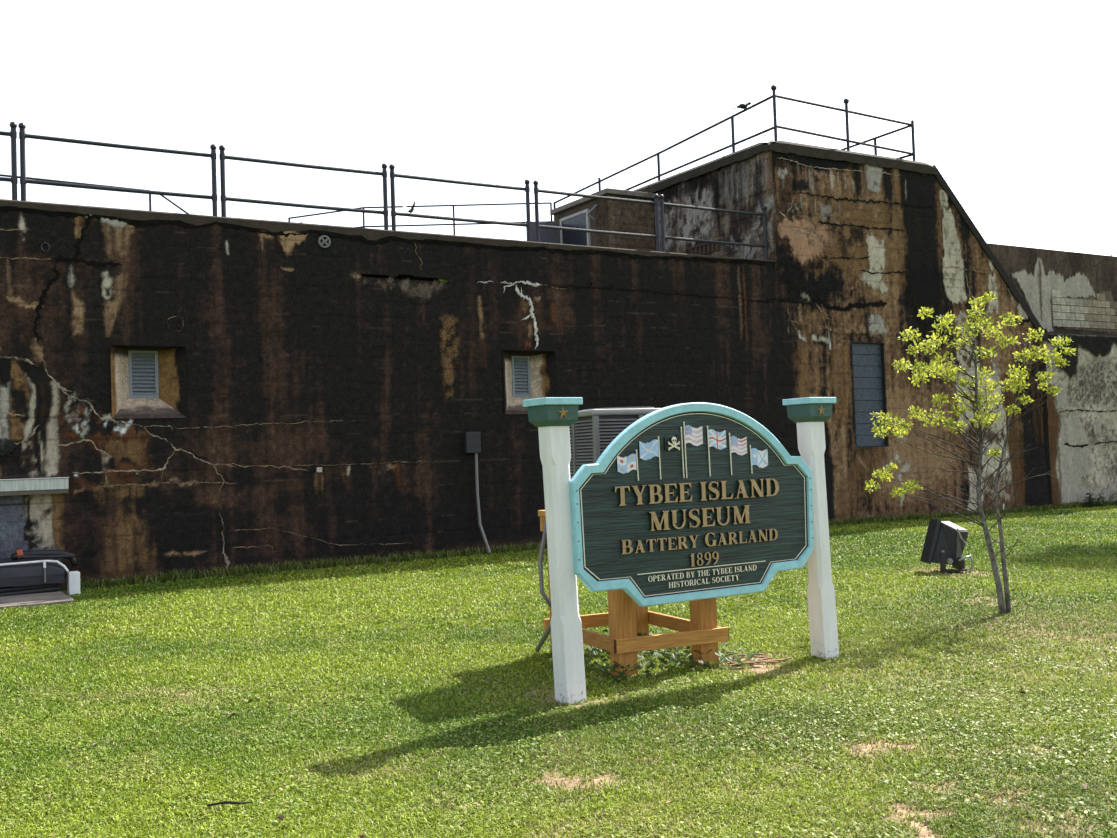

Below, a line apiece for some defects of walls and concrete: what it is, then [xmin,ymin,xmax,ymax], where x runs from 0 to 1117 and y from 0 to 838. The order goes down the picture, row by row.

damp [102,272,123,334]
crack [477,256,906,349]
damp [654,153,952,350]
peeling [778,216,838,265]
crack [796,191,935,231]
peeling [846,233,889,294]
peeling [861,164,882,193]
damp [0,338,91,477]
crack [0,206,766,568]
peeling [939,189,1117,513]
damp [824,424,837,521]
damp [25,489,64,551]